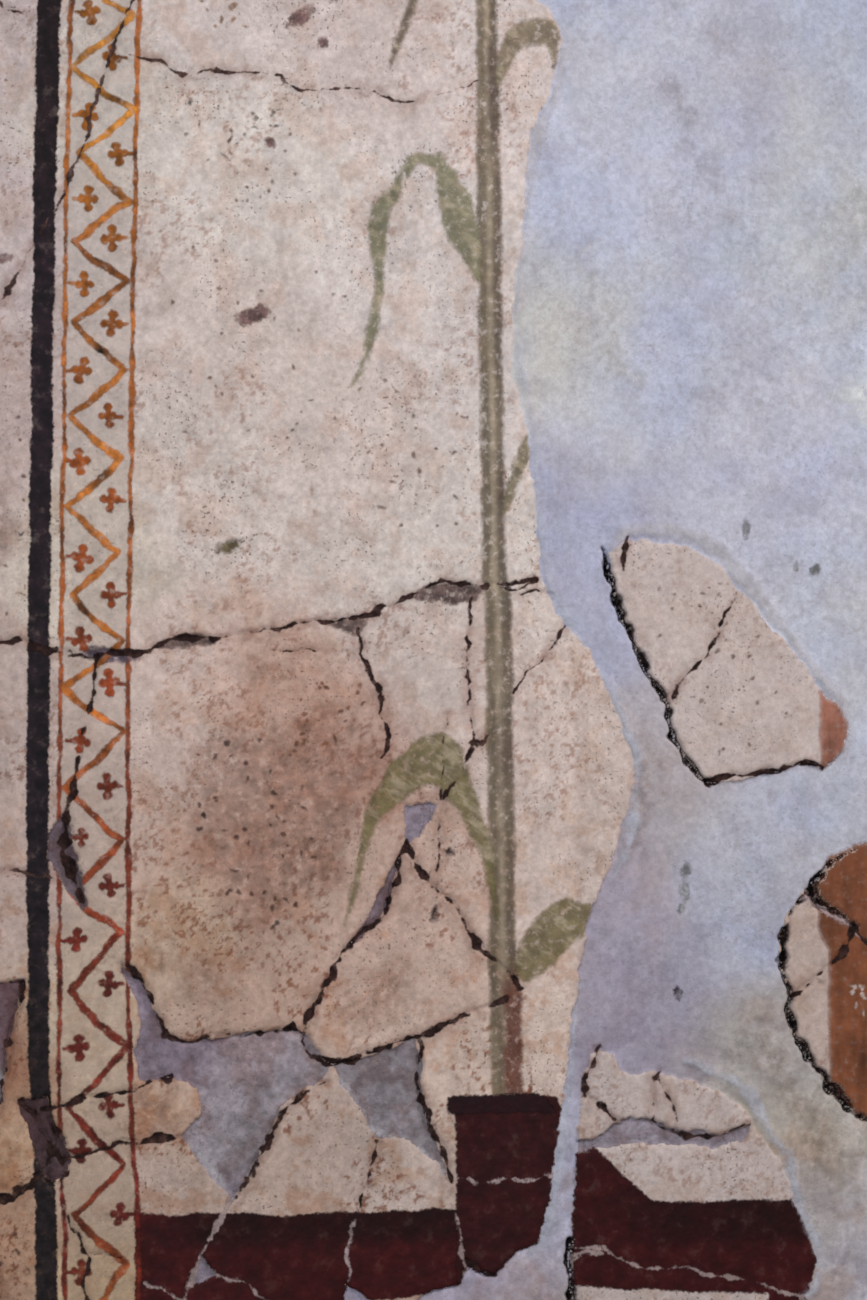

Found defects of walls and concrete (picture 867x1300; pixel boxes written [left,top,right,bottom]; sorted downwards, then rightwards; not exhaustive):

crack [2,0,478,299]
crack [620,536,629,571]
crack [671,606,731,699]
crack [703,759,824,786]
crack [0,576,540,1212]
spalling [678,864,691,913]
crack [790,921,867,997]
spalling [121,967,446,1201]
crack [581,1044,617,1121]
spalling [578,1117,750,1152]
crack [651,1071,751,1140]
crack [67,1215,121,1300]